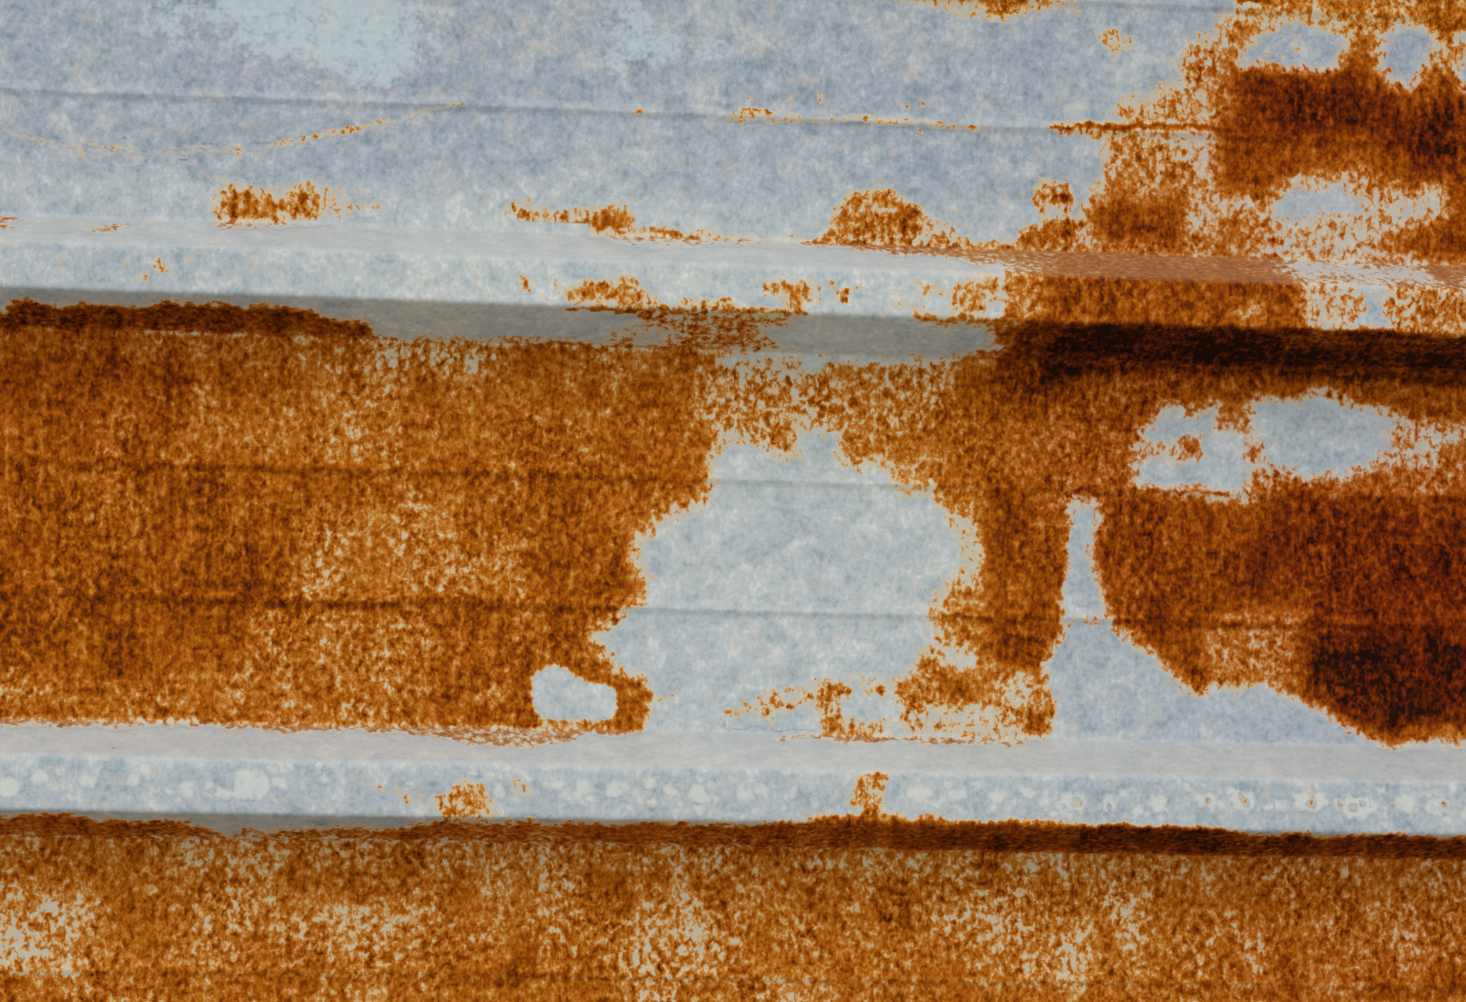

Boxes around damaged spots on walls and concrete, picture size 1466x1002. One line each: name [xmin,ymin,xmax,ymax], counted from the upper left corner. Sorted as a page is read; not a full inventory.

corrosion [0,0,1466,755]
corrosion [0,768,1466,1002]